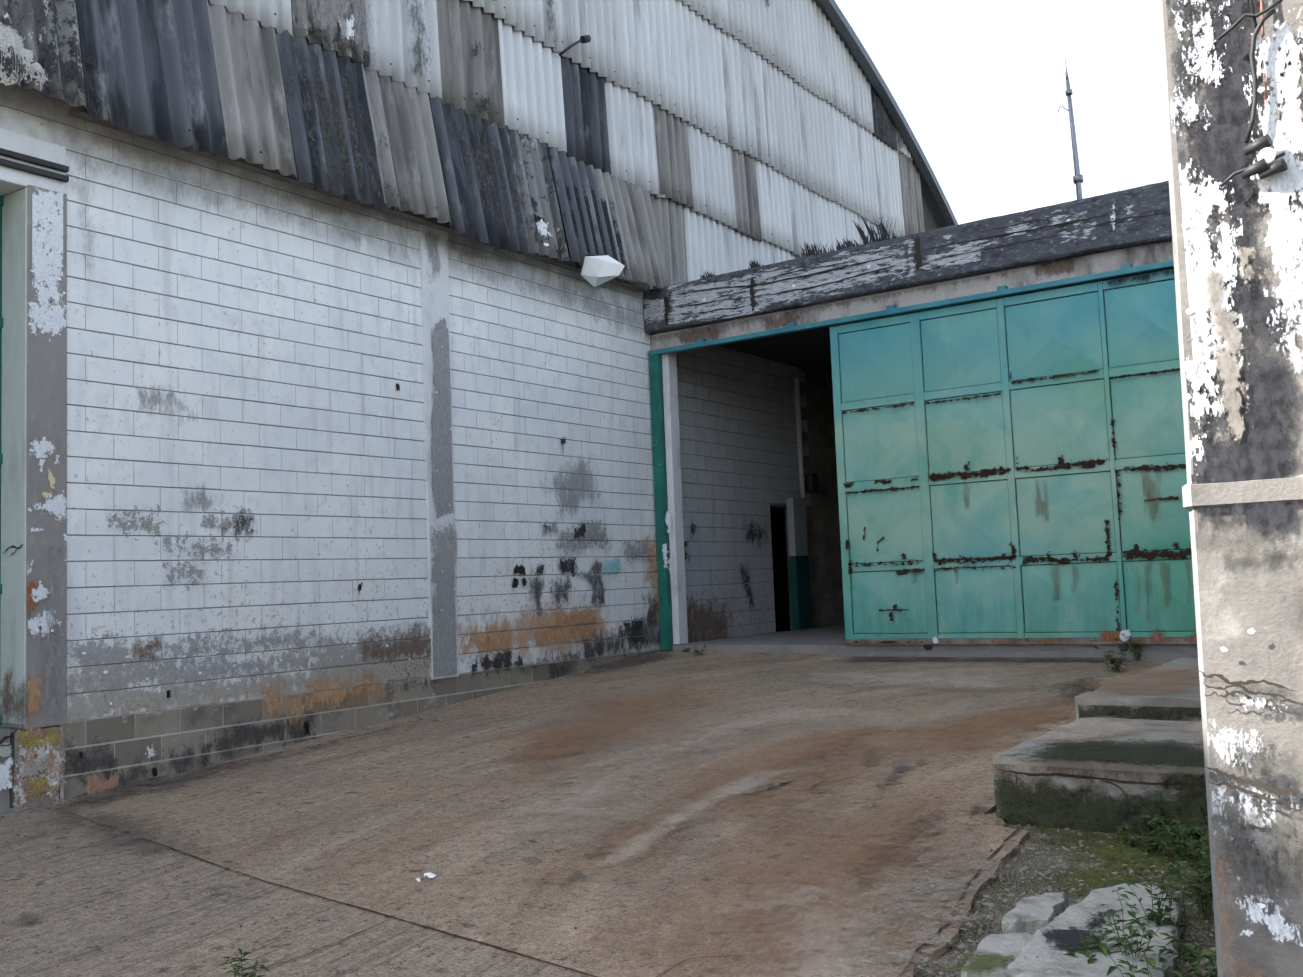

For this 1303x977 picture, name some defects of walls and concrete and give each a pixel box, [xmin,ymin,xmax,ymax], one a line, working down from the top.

peeling [28,181,67,341]
peeling [425,233,440,272]
peeling [1169,0,1303,475]
peeling [0,316,457,810]
damp [470,536,676,681]
corrosion [843,419,1192,576]
corrosion [1079,580,1121,643]
crack [1199,671,1297,703]
damp [30,711,423,857]
crack [897,767,1303,977]